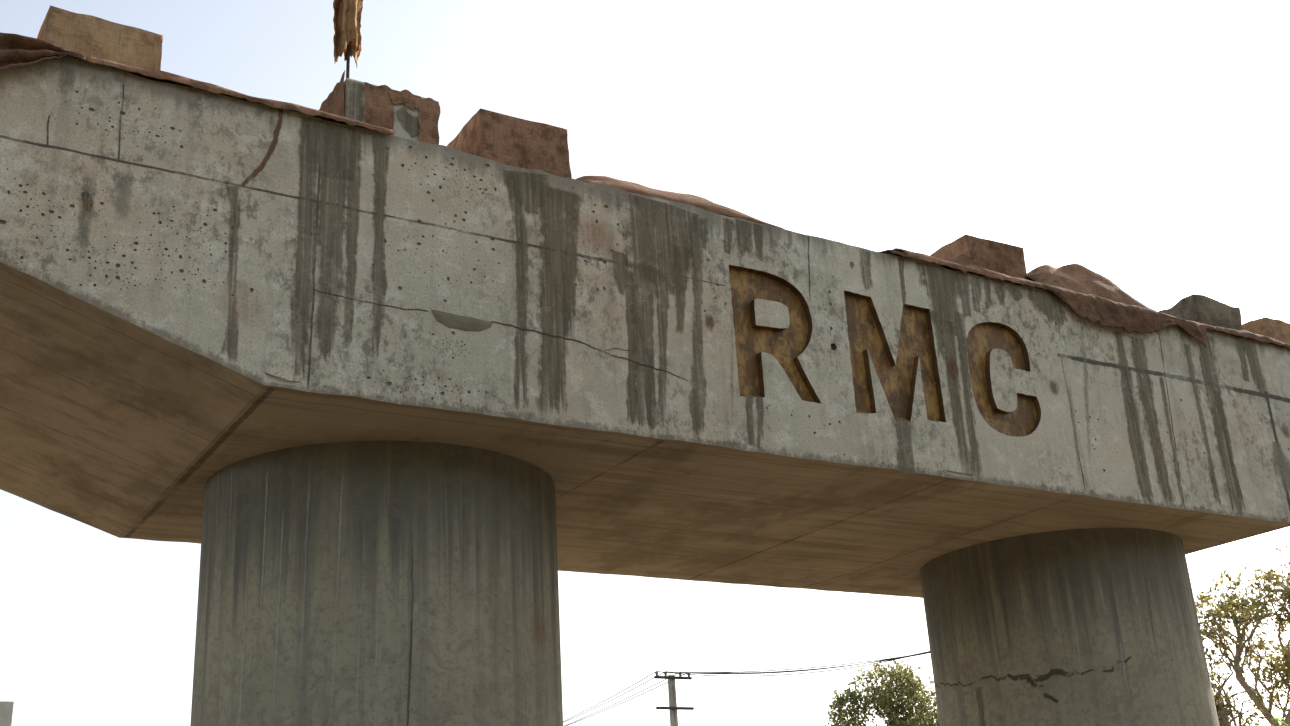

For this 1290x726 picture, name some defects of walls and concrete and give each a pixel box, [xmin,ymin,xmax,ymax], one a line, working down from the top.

crack [242,109,283,186]
water stain [291,80,389,374]
water stain [723,218,763,261]
crack [314,289,429,312]
water stain [504,170,581,411]
crack [491,321,688,381]
water stain [613,194,707,435]
water stain [1238,340,1268,398]
water stain [1116,332,1184,503]
water stain [1184,336,1244,513]
water stain [1273,442,1290,492]
crack [935,656,1131,703]